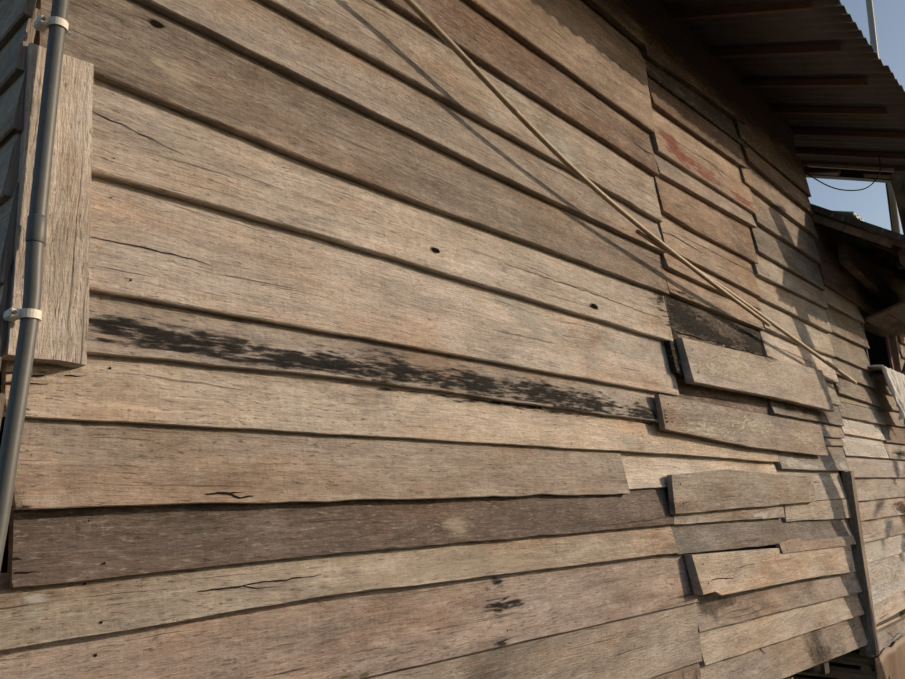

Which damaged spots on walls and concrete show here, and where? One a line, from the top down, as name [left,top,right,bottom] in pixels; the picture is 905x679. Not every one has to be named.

water stain [654,289,772,361]
water stain [89,315,668,425]
crack [206,491,252,499]
crack [197,575,318,592]